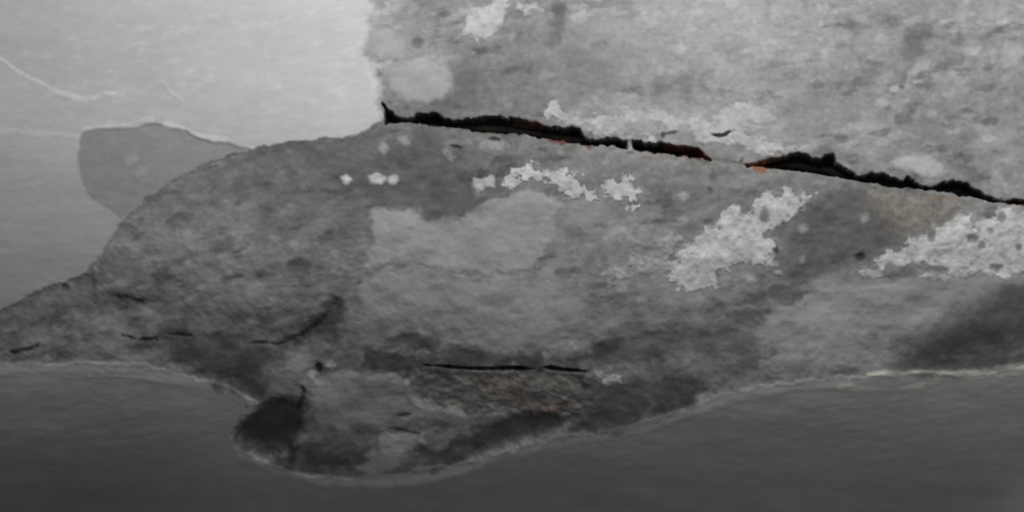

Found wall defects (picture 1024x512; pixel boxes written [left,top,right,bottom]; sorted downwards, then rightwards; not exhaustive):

spalling [0,0,1024,393]
crack [381,101,736,162]
crack [739,151,1018,206]
spalling [222,268,410,442]
crack [422,364,588,373]
spalling [230,352,945,490]
leakage [358,174,908,477]